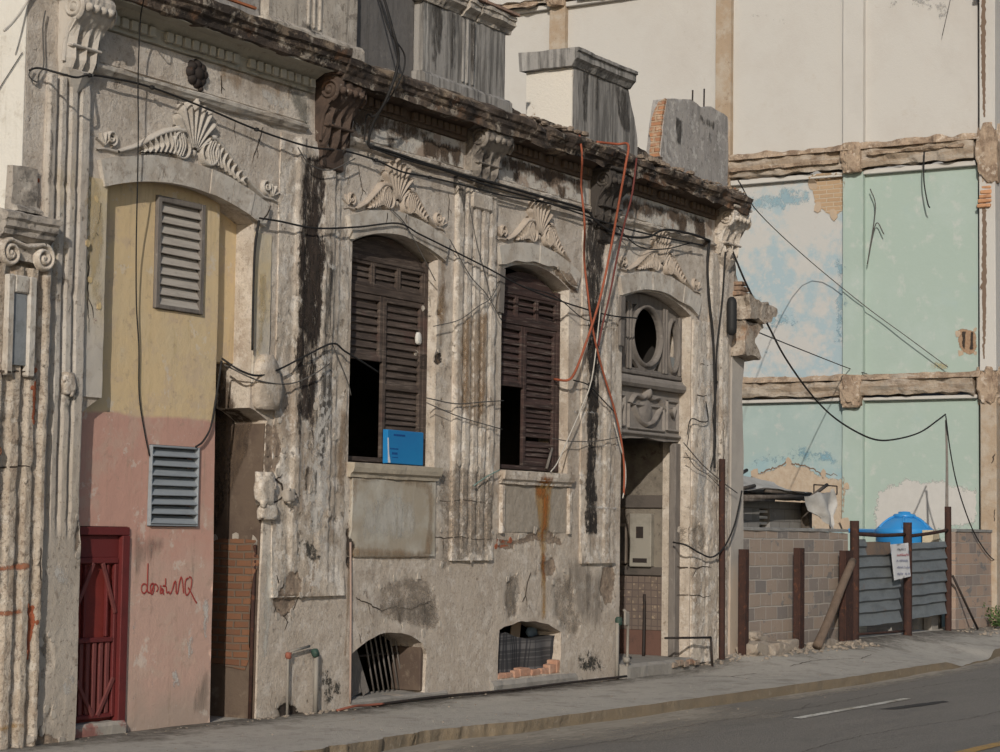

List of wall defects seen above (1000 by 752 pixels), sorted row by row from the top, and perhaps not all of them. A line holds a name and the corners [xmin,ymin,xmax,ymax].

water stain [432,1,476,69]
water stain [616,86,630,131]
water stain [354,106,465,210]
water stain [502,157,583,199]
peeling [752,179,838,221]
water stain [294,156,338,489]
water stain [575,219,616,534]
spalling [751,451,850,529]
spalling [436,459,582,639]
rust [536,477,552,613]
spalling [263,555,306,653]
spalling [378,572,442,638]